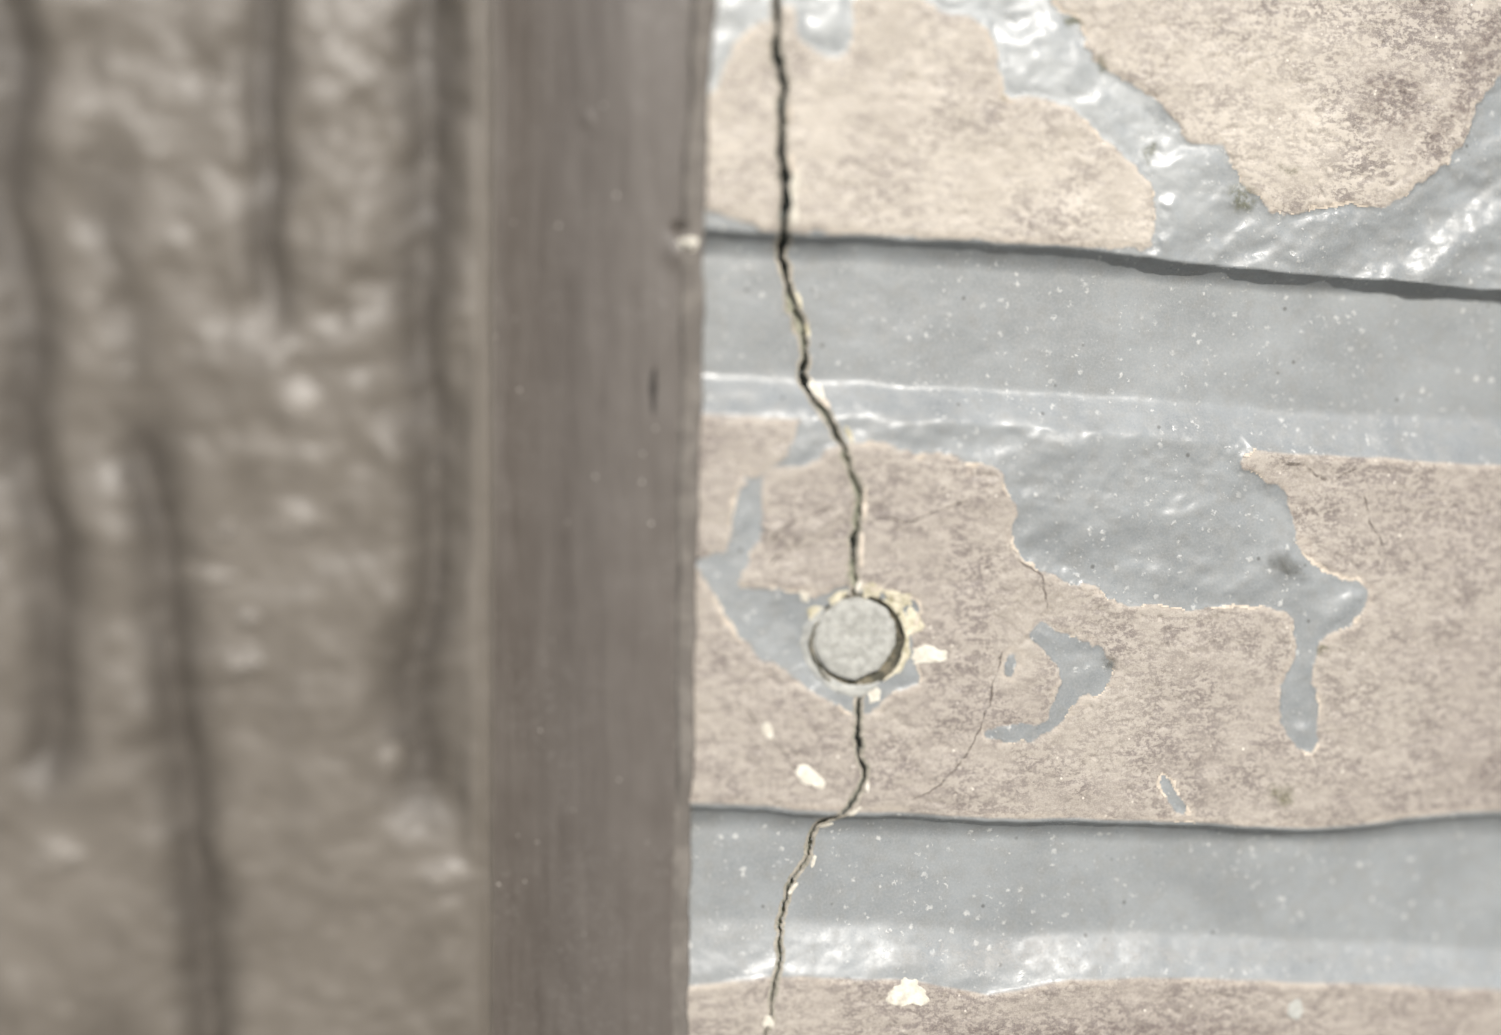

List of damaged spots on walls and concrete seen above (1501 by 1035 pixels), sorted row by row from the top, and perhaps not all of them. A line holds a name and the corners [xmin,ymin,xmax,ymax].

peeling [705,0,1501,292]
crack [767,0,962,598]
peeling [762,722,773,739]
crack [749,682,871,1035]
peeling [696,477,947,715]
peeling [886,977,930,1007]
peeling [776,416,1367,756]
peeling [1156,772,1197,825]